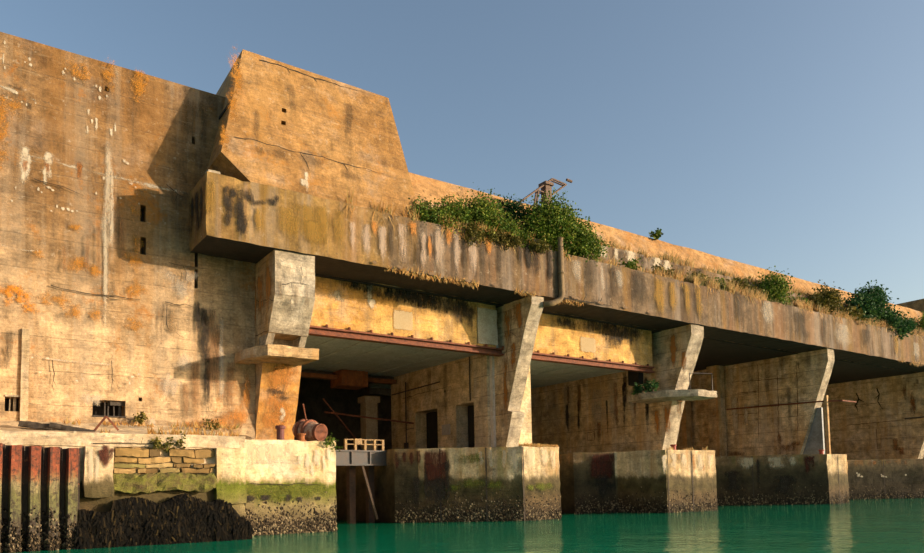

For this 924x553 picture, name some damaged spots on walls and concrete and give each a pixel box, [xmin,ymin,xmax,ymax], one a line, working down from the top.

crack [233,136,383,174]
leakage [104,152,176,304]
leakage [223,187,295,233]
leakage [306,207,442,264]
leakage [455,234,485,270]
leakage [336,280,476,329]
leakage [196,302,210,404]
leakage [554,317,642,348]
rust [395,451,447,484]
rust [590,453,615,479]